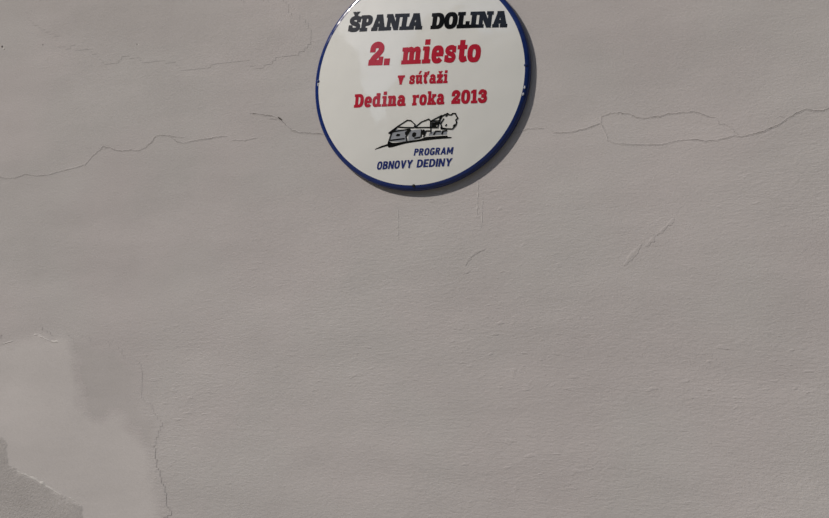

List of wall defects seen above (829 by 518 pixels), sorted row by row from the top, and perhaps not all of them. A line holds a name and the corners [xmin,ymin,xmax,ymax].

crack [250,112,323,135]
crack [512,107,829,146]
crack [0,134,257,179]